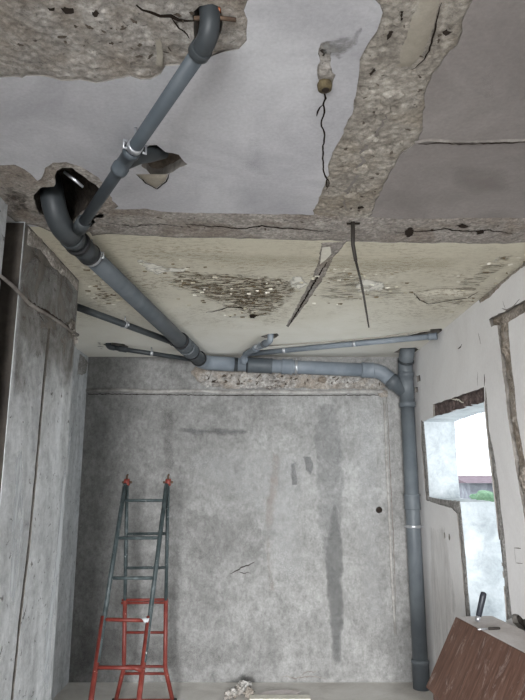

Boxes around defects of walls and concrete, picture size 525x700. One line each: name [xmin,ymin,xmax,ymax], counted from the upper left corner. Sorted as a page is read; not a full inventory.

spalling [0,0,247,81]
spalling [0,162,123,305]
spalling [86,0,525,327]
spalling [191,367,386,390]